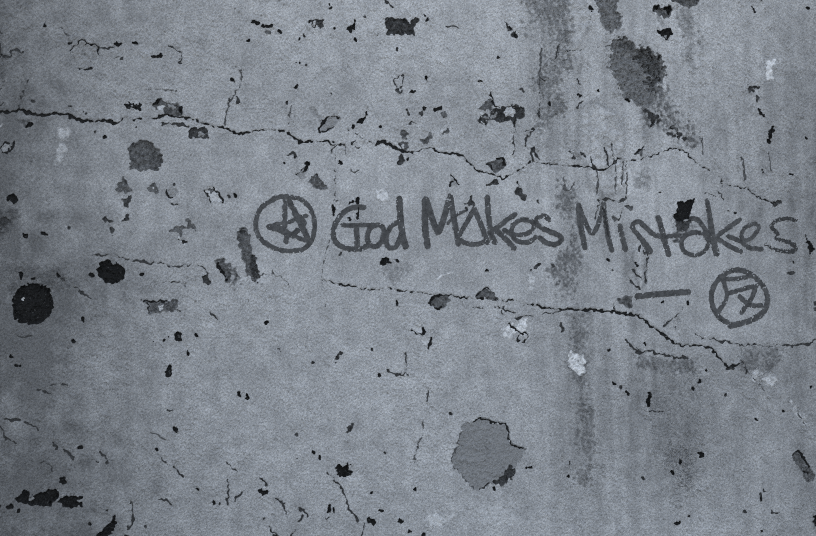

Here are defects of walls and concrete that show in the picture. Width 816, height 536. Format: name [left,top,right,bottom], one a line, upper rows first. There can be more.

crack [0,32,24,58]
spalling [377,14,429,36]
spalling [588,0,667,127]
spalling [477,92,525,125]
crack [0,45,774,237]
spalling [102,140,163,236]
spalling [673,198,695,232]
spalling [12,271,54,325]
spalling [85,259,125,284]
crack [321,240,816,391]
spalling [451,417,533,491]
spalling [0,476,83,513]